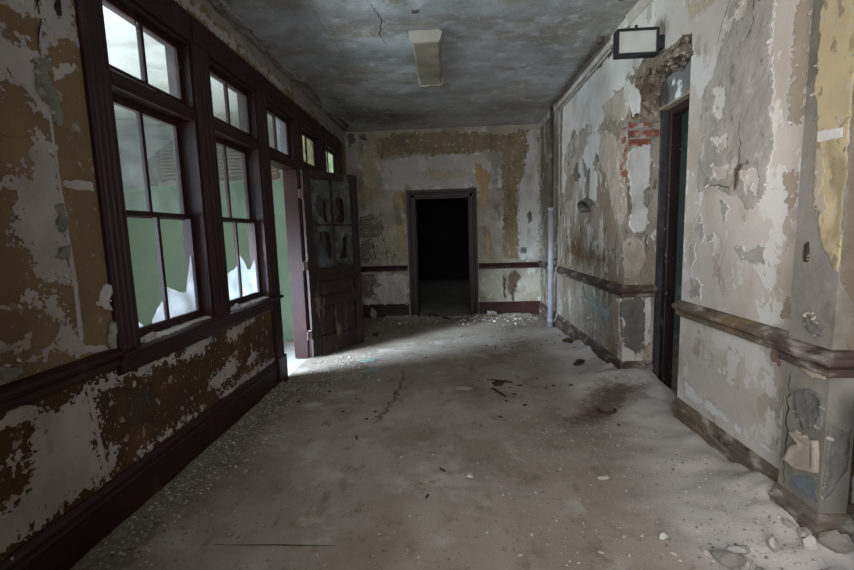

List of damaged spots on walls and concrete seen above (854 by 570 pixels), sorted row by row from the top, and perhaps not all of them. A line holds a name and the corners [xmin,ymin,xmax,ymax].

peeling [0,0,118,385]
peeling [175,0,540,262]
peeling [561,34,694,279]
spalling [695,0,778,222]
peeling [782,169,799,210]
spalling [734,242,767,266]
peeling [0,336,213,561]
peeling [207,318,275,398]
crack [373,370,405,423]
spalling [619,297,652,352]
peeling [780,296,791,319]
peeling [782,388,825,473]